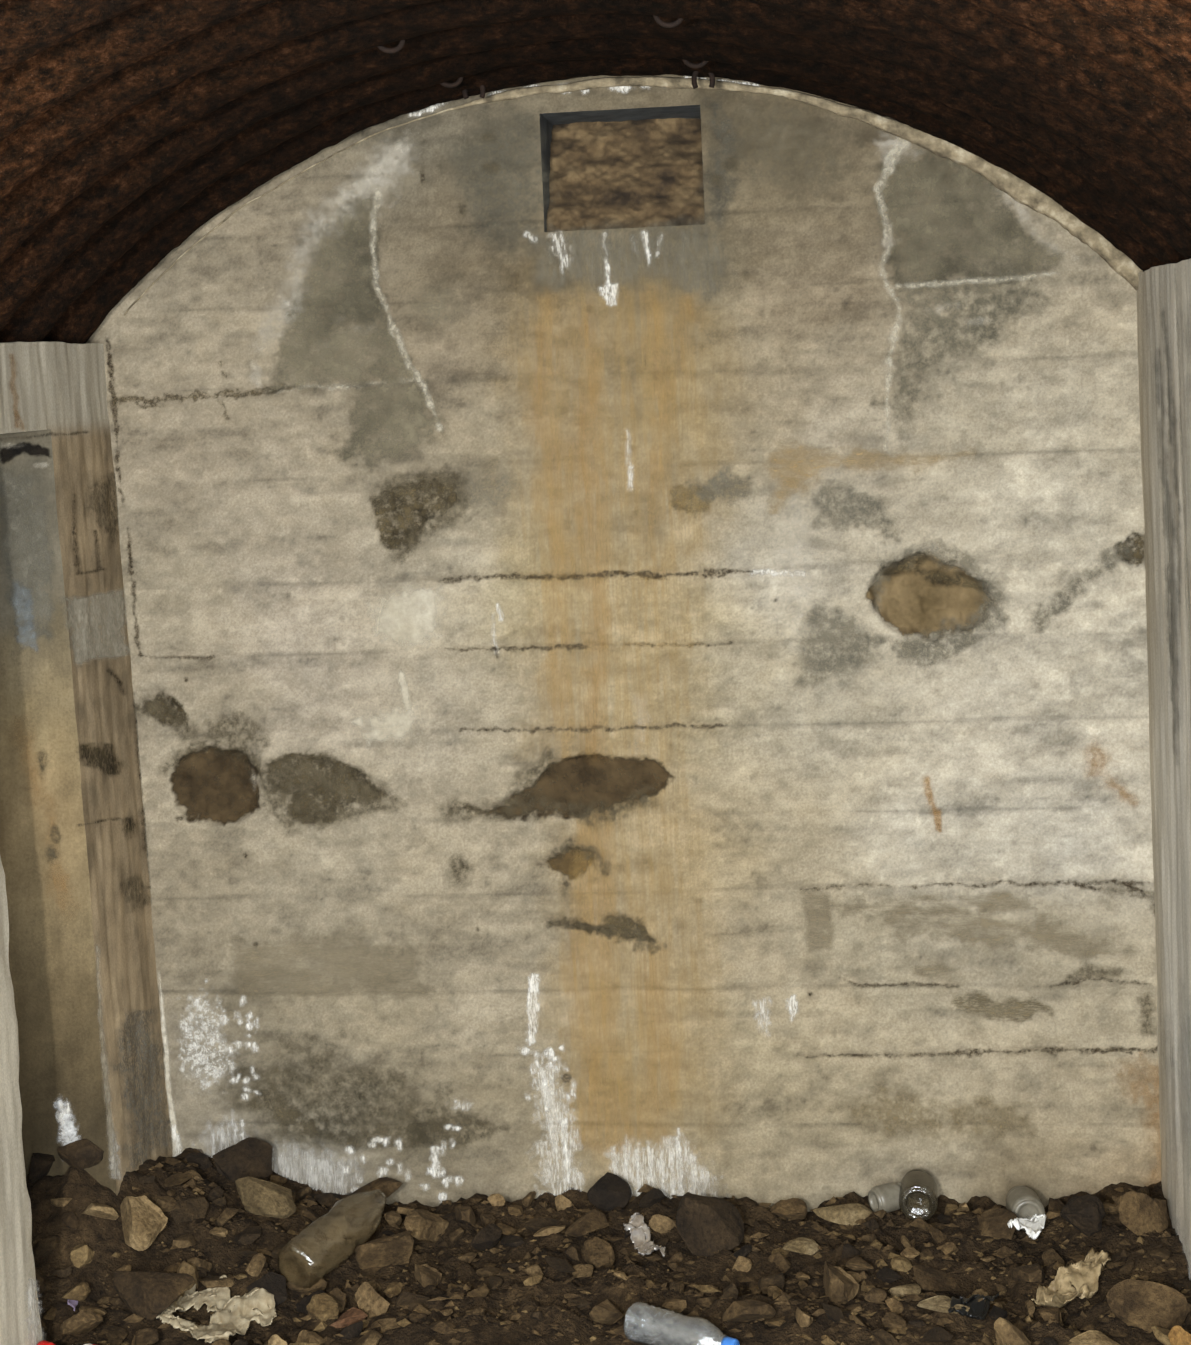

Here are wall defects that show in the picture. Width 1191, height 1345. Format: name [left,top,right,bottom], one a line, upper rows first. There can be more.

spalling [372,473,466,559]
crack [3,340,295,848]
spalling [866,548,1008,649]
spalling [134,693,397,828]
spalling [446,751,673,824]
spalling [547,839,608,886]
spalling [549,915,655,951]
leakage [96,938,493,1201]
efflorescence [522,974,584,1196]
efflorescence [608,1128,716,1198]